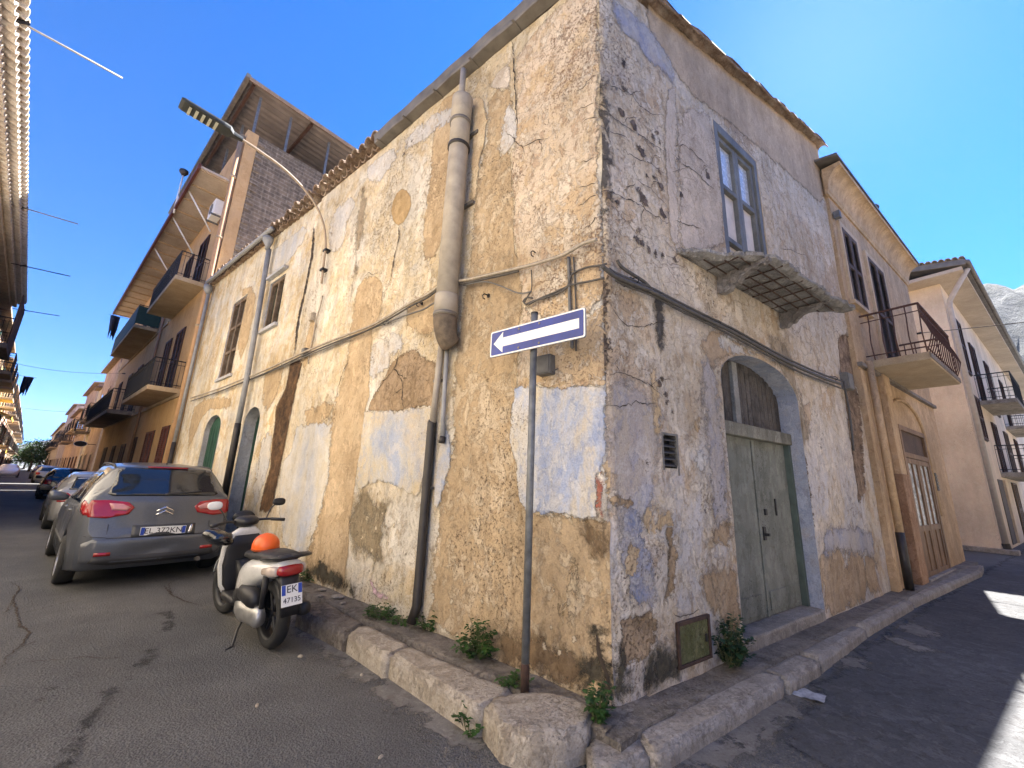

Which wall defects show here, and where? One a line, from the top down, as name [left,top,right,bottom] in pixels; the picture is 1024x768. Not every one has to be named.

crack [506,42,548,151]
crack [578,75,714,228]
spalling [613,2,834,312]
crack [293,228,314,355]
spalling [252,0,678,699]
crack [605,362,666,407]